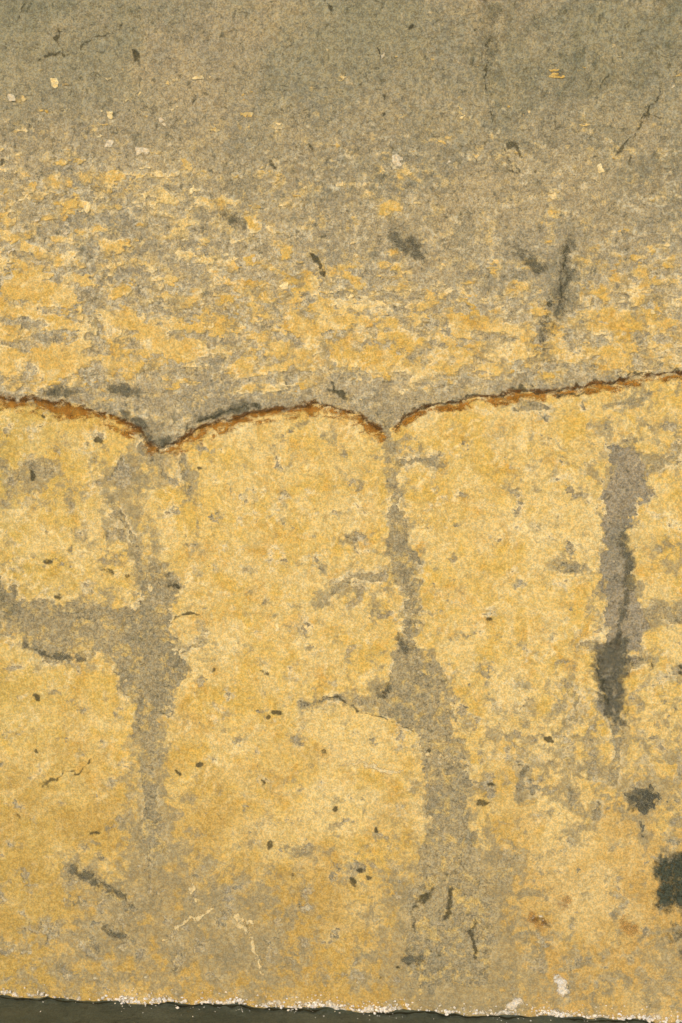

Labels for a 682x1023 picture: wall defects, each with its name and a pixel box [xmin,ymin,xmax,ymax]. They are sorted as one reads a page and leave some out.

peeling [88,110,120,154]
peeling [0,147,682,403]
crack [161,403,260,447]
crack [328,382,354,400]
crack [397,368,680,428]
damp [590,532,636,726]
mould [653,852,682,911]